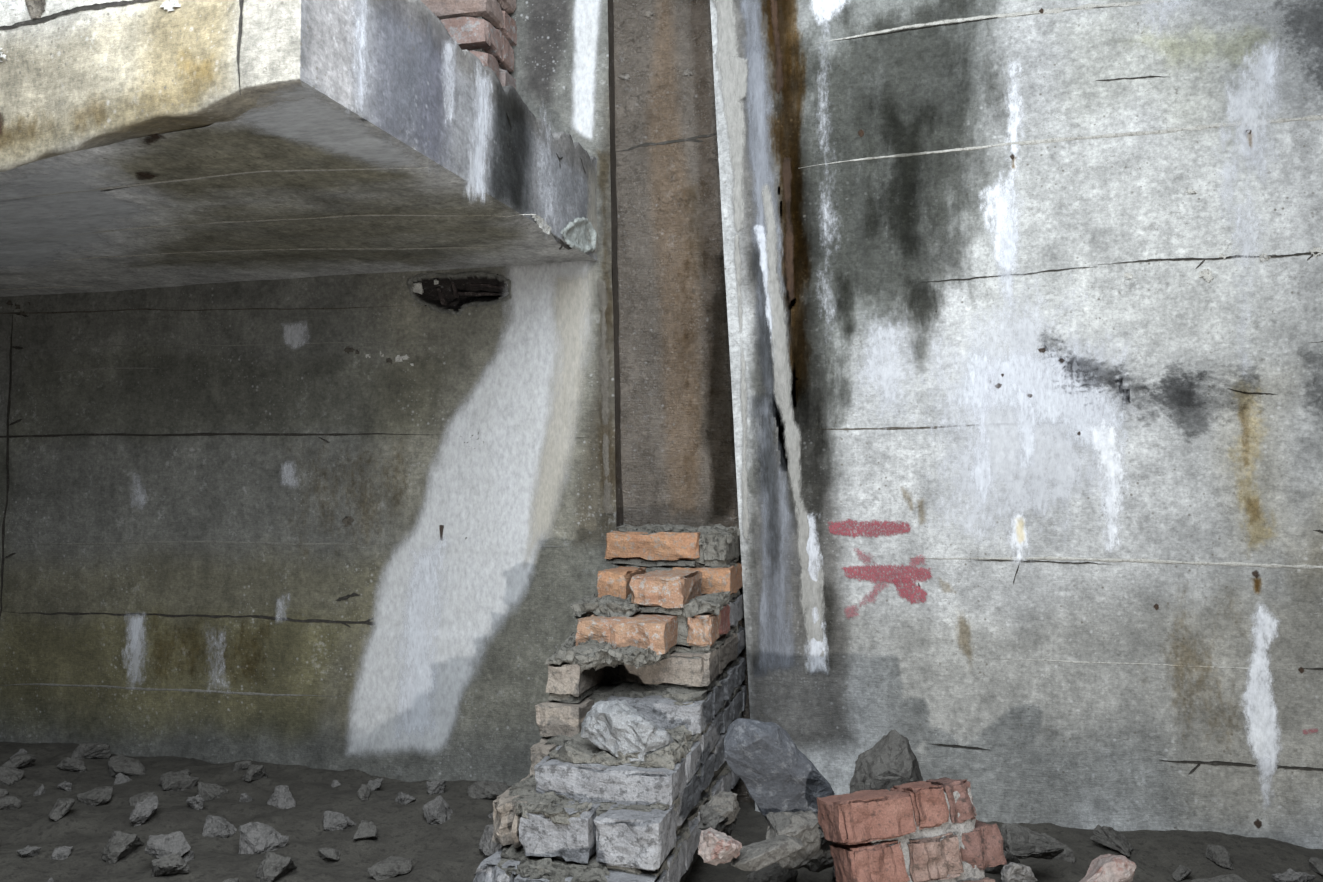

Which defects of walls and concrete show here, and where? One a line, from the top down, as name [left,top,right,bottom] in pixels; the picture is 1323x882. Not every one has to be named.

spalling [0,0,46,18]
crack [0,0,151,30]
efflorescence [811,0,846,24]
crack [236,0,244,95]
leakage [246,88,412,165]
efflorescence [468,70,492,197]
efflorescence [980,63,1023,299]
crack [929,251,1323,282]
hole [407,271,511,316]
crack [979,560,1098,584]
efflorescence [1244,606,1280,799]
crack [1161,760,1323,774]